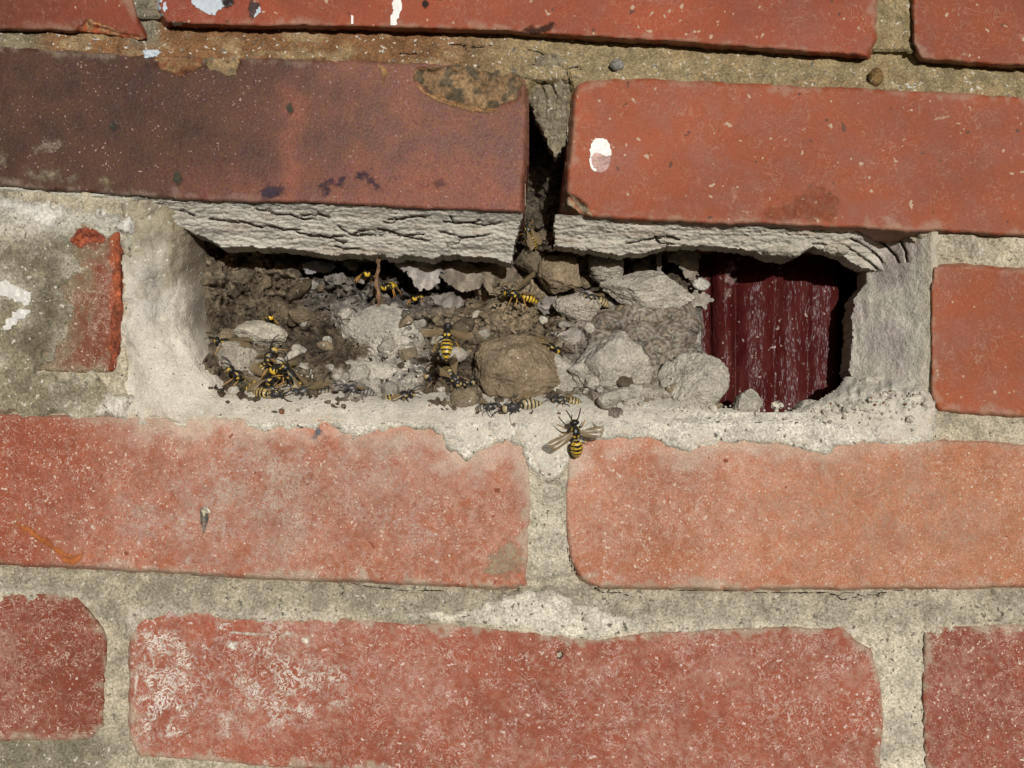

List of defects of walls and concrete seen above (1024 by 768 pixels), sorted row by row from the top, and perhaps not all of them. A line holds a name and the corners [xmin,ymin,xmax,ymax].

spalling [372,61,524,113]
peeling [0,198,63,226]
crack [180,209,497,250]
spalling [562,192,591,218]
crack [625,236,680,245]
spalling [70,208,135,371]